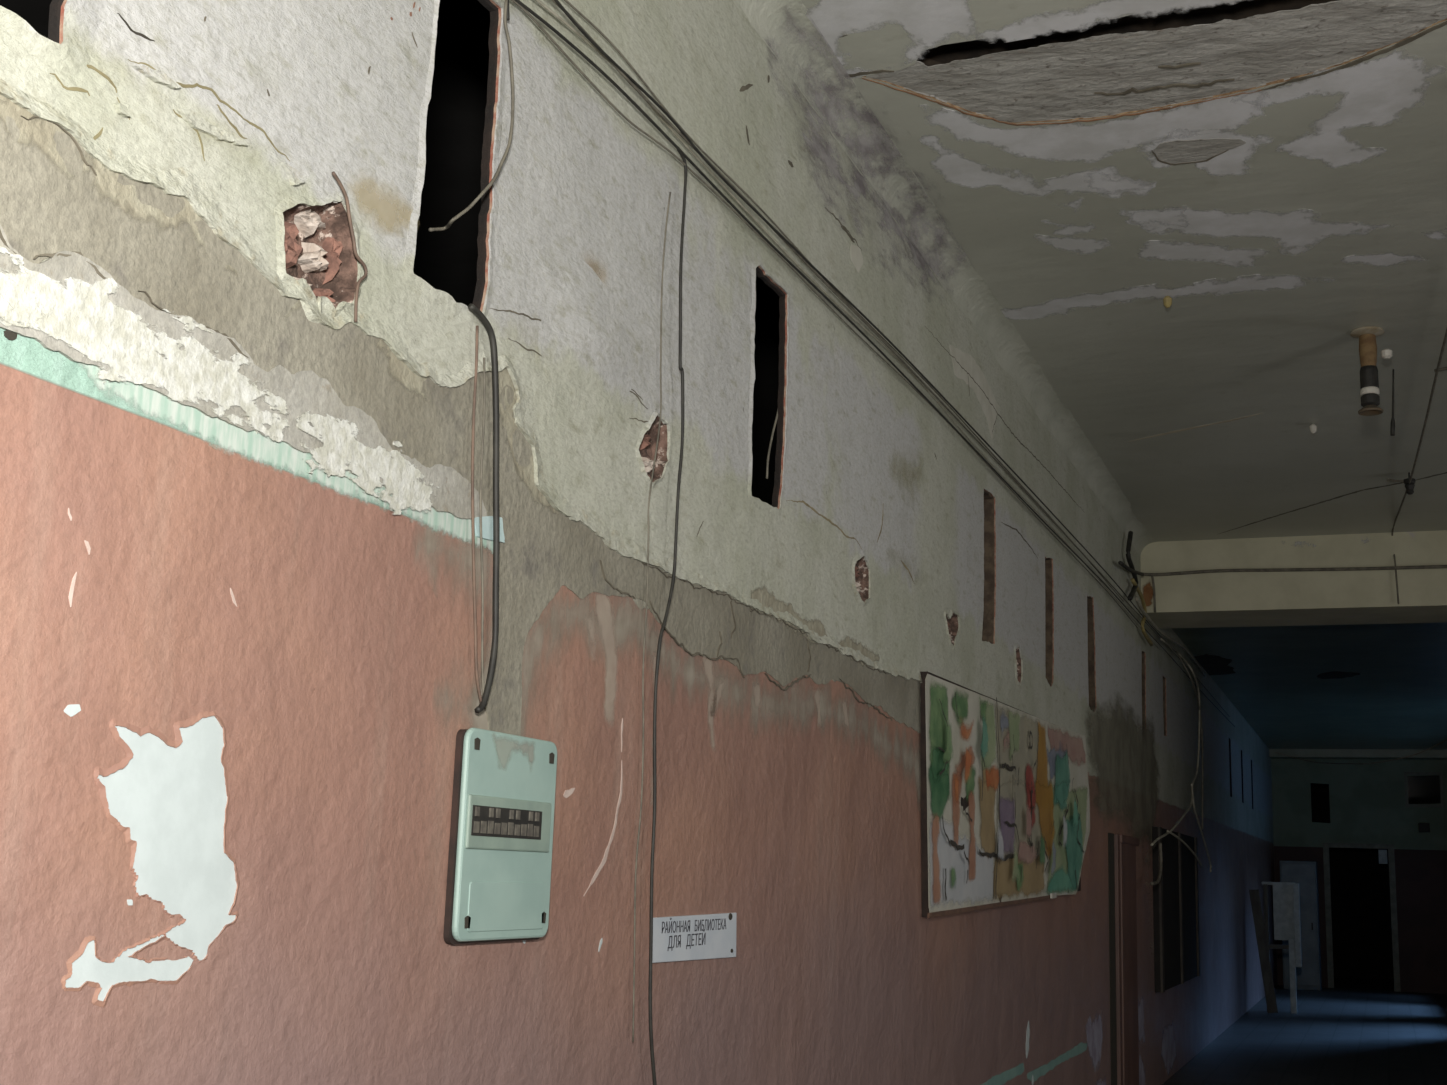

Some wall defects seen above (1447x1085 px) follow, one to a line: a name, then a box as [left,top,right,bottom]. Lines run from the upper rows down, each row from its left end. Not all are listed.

peeling [131,65,181,89]
leakage [793,24,966,285]
spalling [806,0,1447,320]
spalling [0,77,922,736]
peeling [949,344,999,439]
peeling [61,711,240,1008]